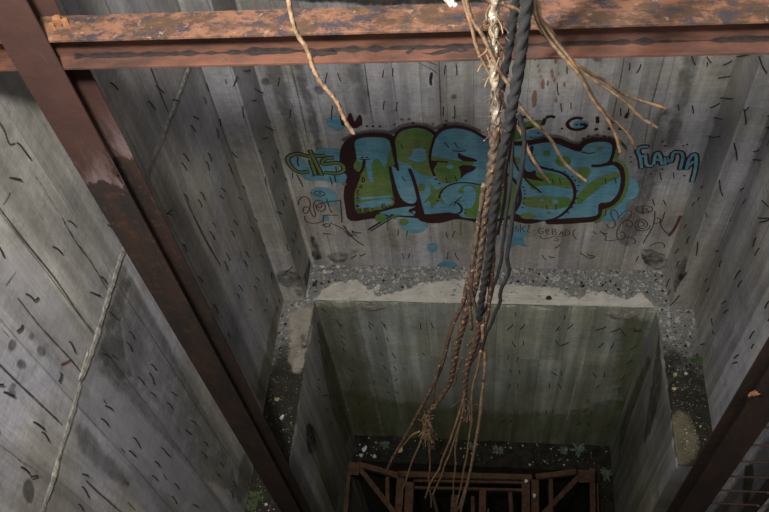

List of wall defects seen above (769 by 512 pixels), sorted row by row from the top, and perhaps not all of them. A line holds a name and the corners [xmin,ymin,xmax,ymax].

corrosion [528,35,769,47]
corrosion [74,43,516,59]
corrosion [532,59,565,107]